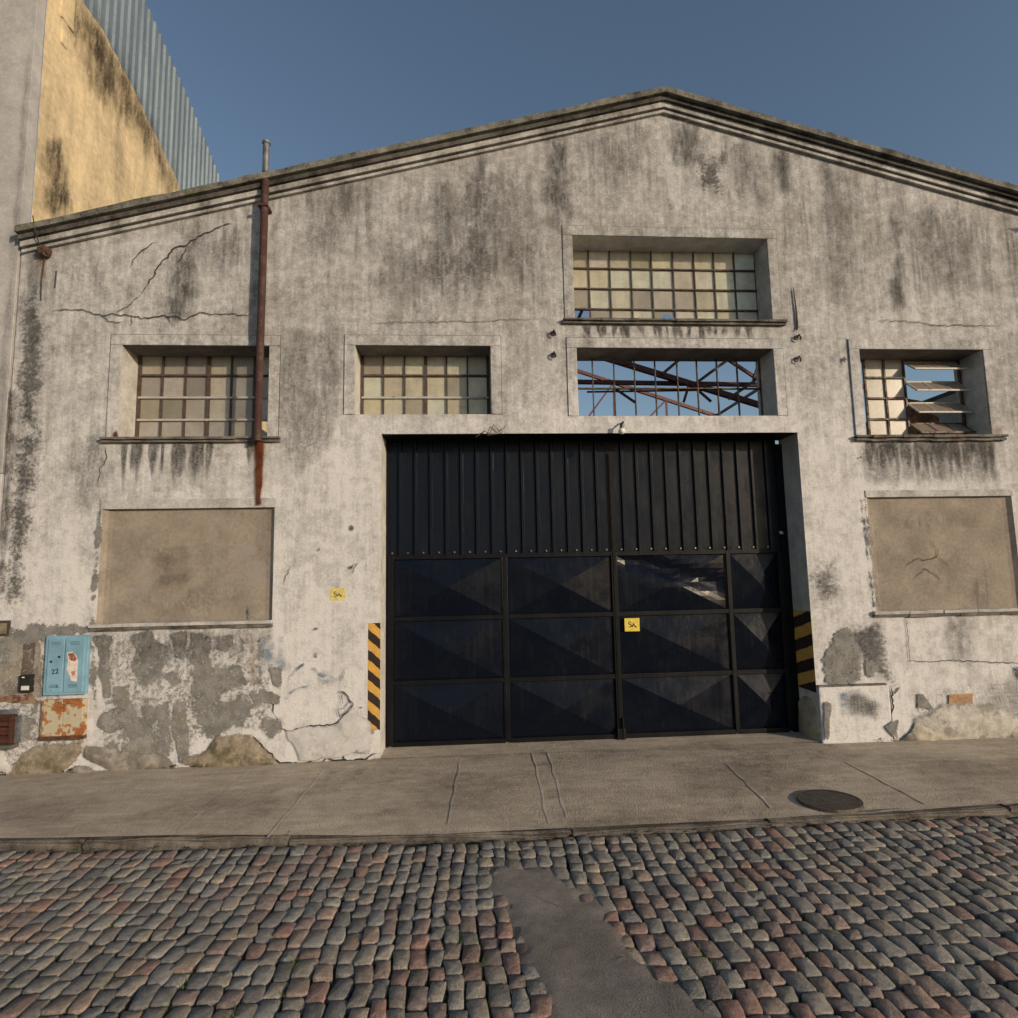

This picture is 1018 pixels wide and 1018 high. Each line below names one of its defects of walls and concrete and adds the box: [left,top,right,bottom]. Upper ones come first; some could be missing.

damp [675,134,725,193]
crack [53,223,250,324]
damp [0,286,50,605]
damp [121,443,213,473]
rust [255,442,264,505]
damp [866,441,994,467]
peeling [91,501,103,604]
peeling [822,627,880,685]
peeling [0,617,285,775]
crack [270,691,353,732]
flaking render [911,684,1018,717]
crack [253,737,377,764]